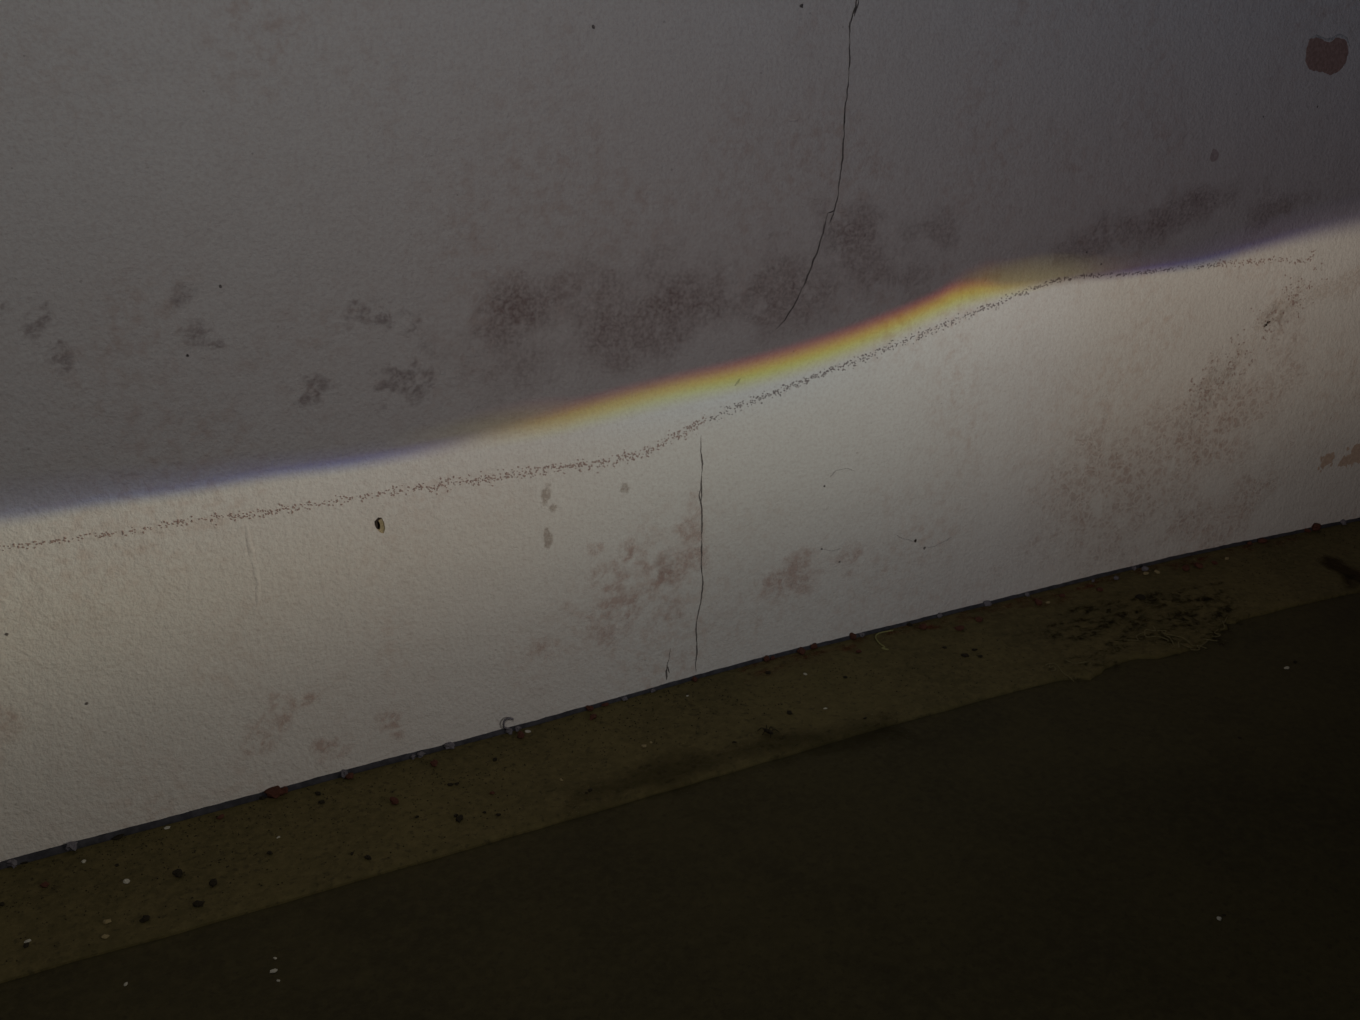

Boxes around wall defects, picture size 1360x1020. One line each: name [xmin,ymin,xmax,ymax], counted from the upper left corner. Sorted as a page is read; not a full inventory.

crack [776,0,859,329]
spalling [1305,34,1350,75]
crack [666,453,704,680]